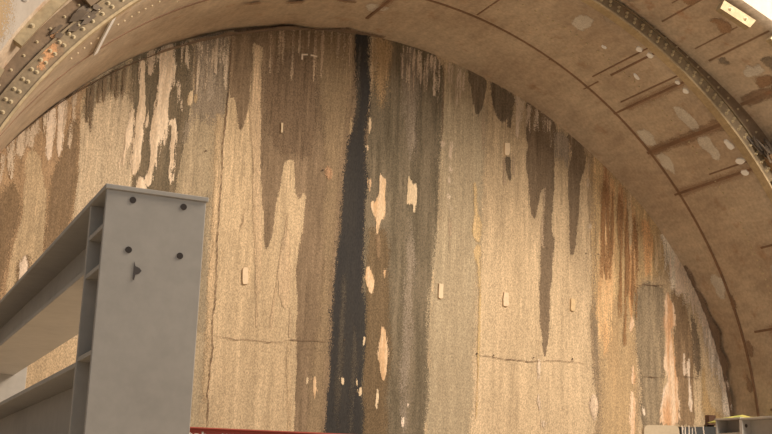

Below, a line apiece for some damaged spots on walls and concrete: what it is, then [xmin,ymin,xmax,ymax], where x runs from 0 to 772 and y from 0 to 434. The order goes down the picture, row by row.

rust [36,30,60,72]
rust [741,75,772,107]
spalling [406,176,417,212]
crack [207,35,324,426]
water stain [0,27,619,434]
rust [583,155,669,434]
spalling [377,327,390,381]
crack [481,355,587,364]
water stain [617,232,732,434]